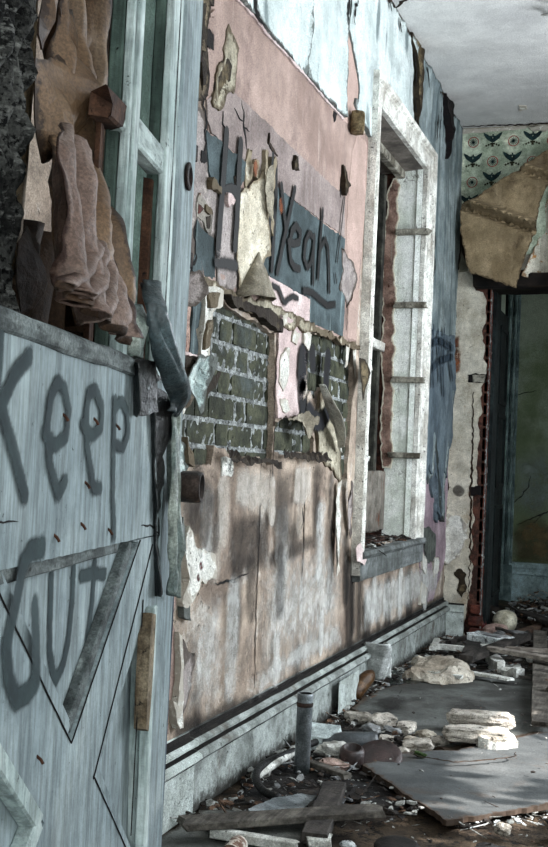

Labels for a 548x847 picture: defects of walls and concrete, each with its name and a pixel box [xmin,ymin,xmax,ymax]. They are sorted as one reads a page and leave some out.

flaking render [198,0,239,111]
peeling [196,133,278,233]
flaking render [180,286,351,483]
flaking render [468,373,487,383]
peeling [418,329,469,606]
peeling [177,517,217,621]
damp [177,468,444,737]
peeling [169,631,195,729]